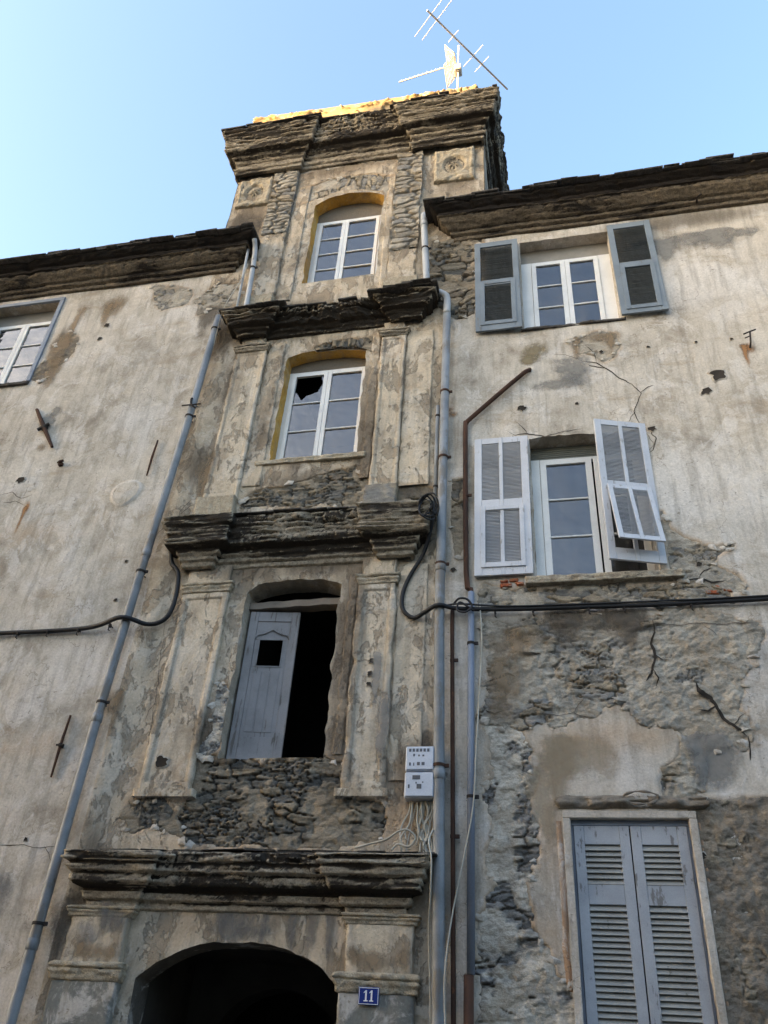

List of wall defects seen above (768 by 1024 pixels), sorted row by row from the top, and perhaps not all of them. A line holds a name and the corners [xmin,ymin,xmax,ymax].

crack [556,346,657,453]
spalling [238,467,369,510]
crack [640,619,757,687]
spalling [119,681,387,851]
spalling [474,511,768,1024]
crack [696,683,751,760]